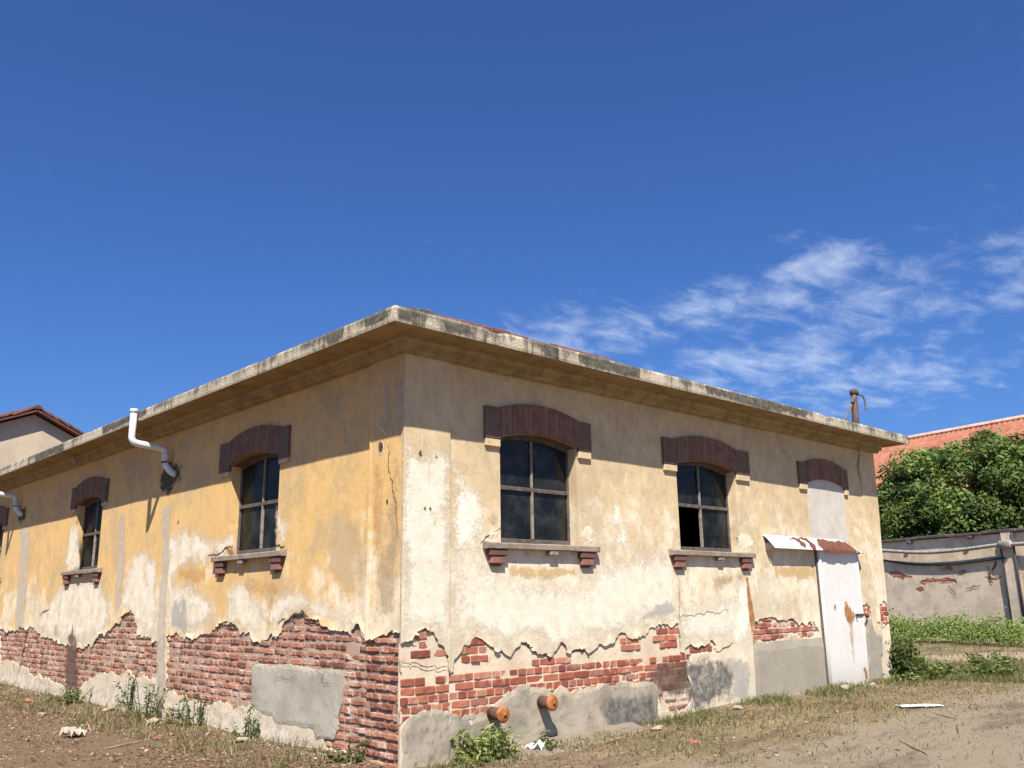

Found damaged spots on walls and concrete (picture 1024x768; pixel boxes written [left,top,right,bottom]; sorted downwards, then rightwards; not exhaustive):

water stain [1,506,313,745]
water stain [378,507,398,613]
peeling [0,439,818,768]
corrosion [787,537,864,554]
corrosion [834,602,854,652]
spalling [863,602,890,625]
spalling [890,567,957,592]
water stain [684,658,750,708]